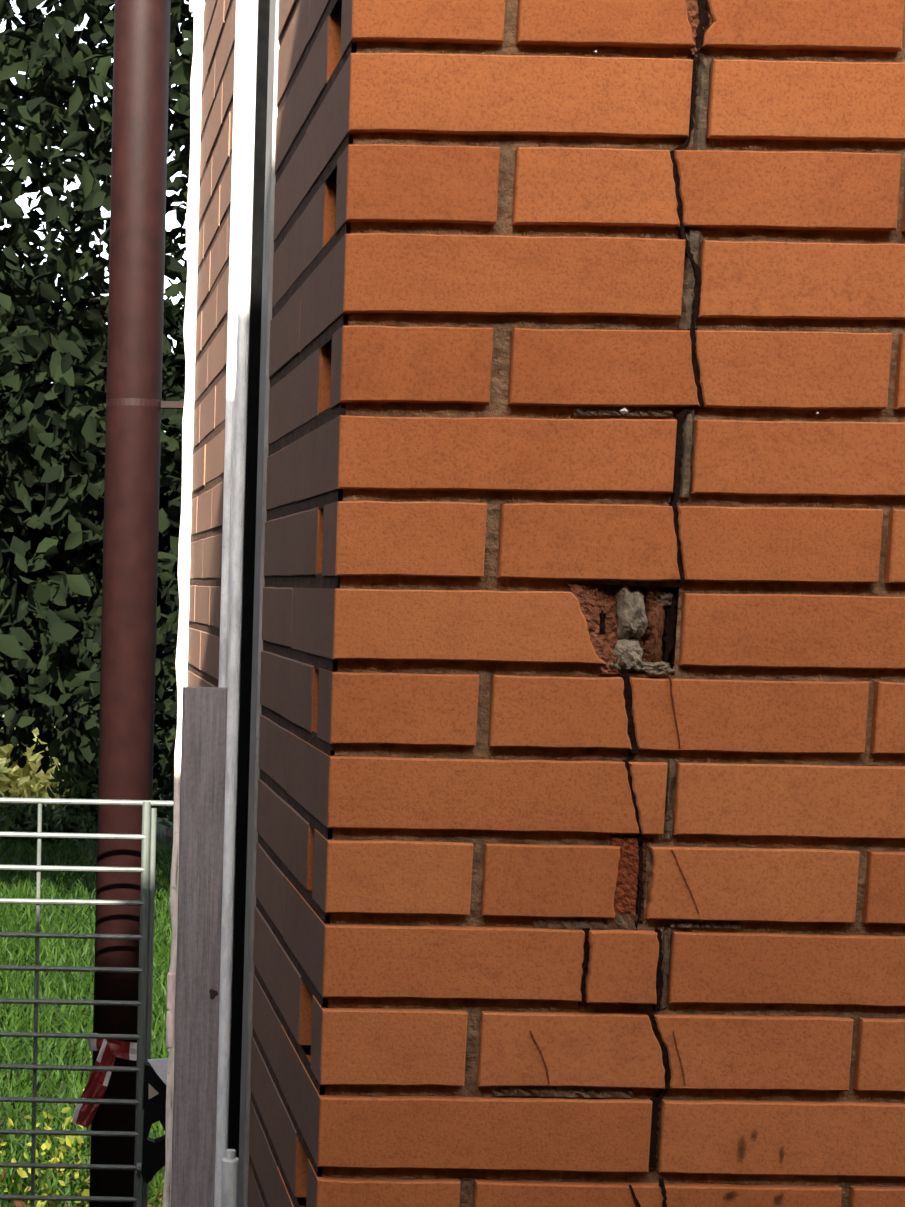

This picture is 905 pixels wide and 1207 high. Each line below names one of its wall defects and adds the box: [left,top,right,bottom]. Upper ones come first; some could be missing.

crack [669,0,710,582]
spalling [568,584,679,676]
spalling [610,837,656,931]
crack [618,668,700,914]
crack [530,1030,549,1083]
crack [629,928,686,1207]